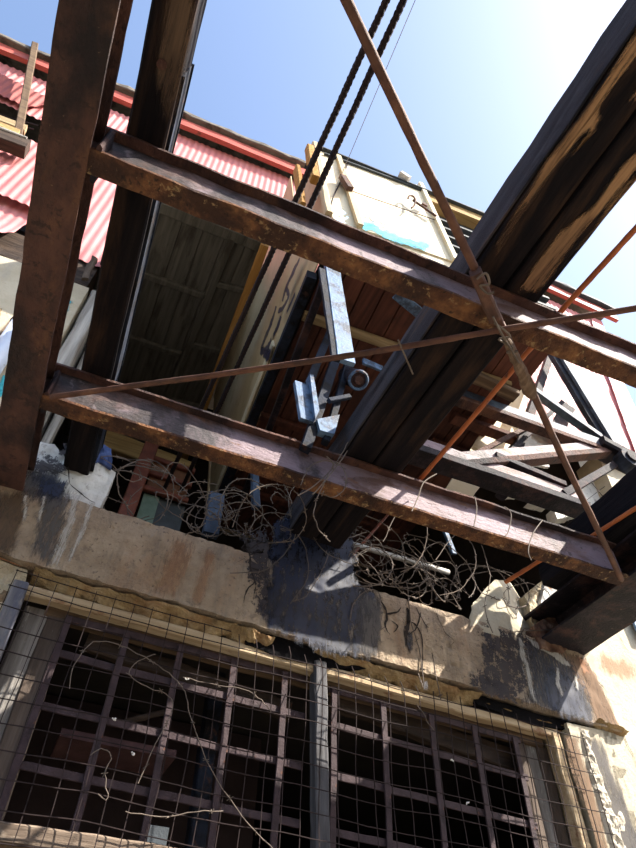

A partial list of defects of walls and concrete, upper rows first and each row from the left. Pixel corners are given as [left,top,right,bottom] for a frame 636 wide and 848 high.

corrosion [0,492,29,555]
peeling [580,718,629,848]